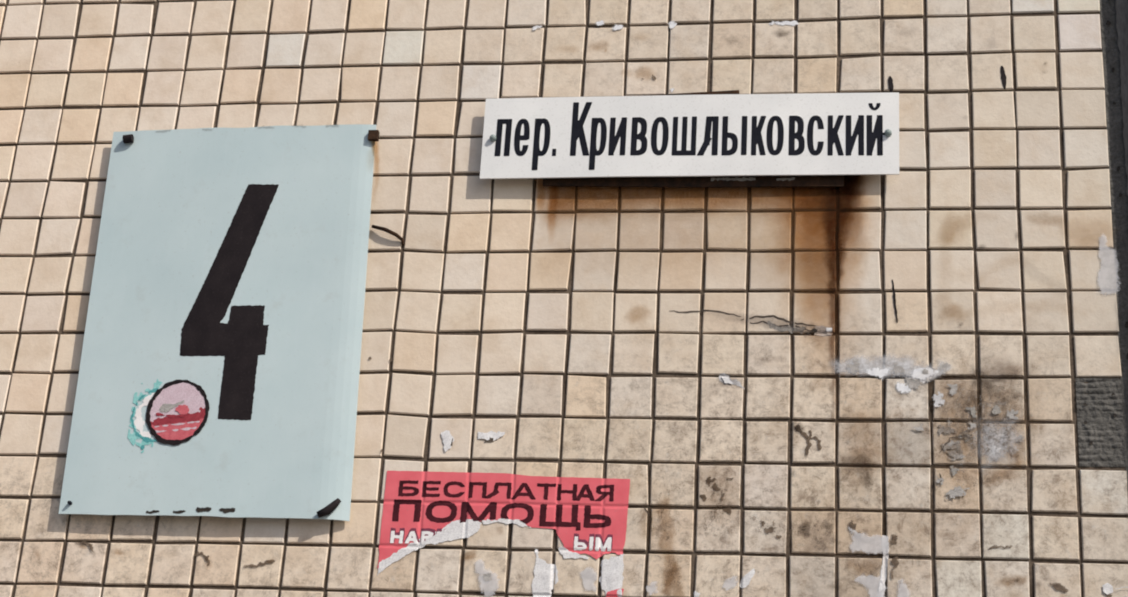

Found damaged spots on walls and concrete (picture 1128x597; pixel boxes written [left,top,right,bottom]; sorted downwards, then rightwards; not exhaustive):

corrosion [826,175,859,318]
spalling [1075,378,1126,467]